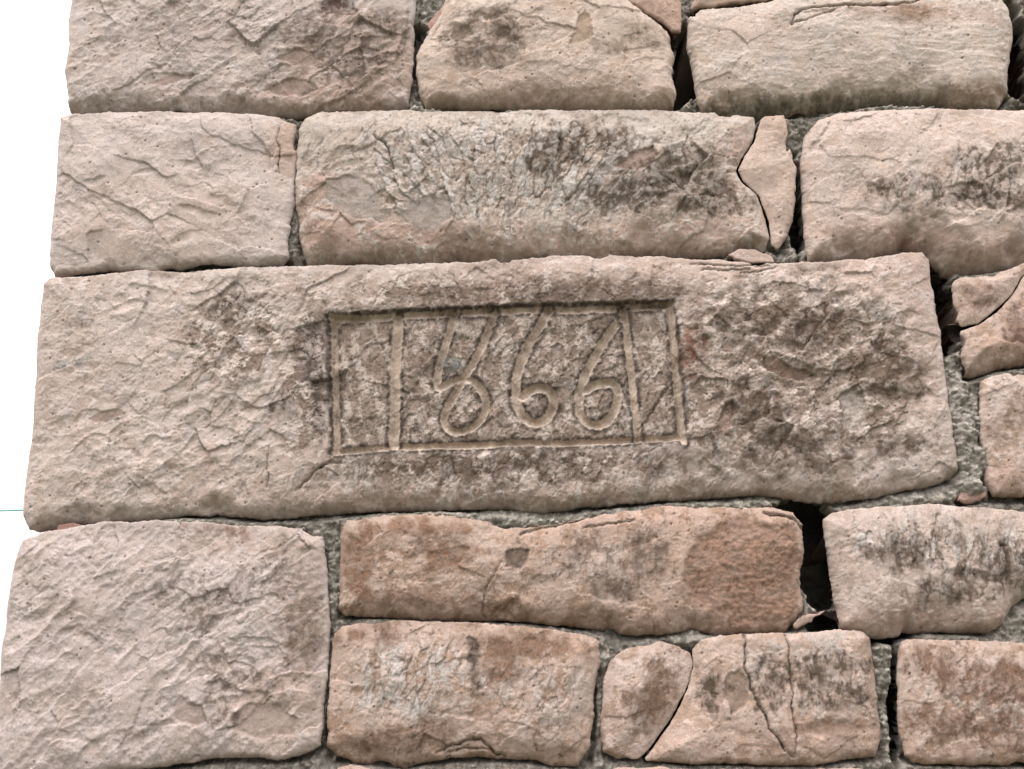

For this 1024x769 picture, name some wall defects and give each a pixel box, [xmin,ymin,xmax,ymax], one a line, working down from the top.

crack [736,135,775,253]
crack [948,277,1023,342]